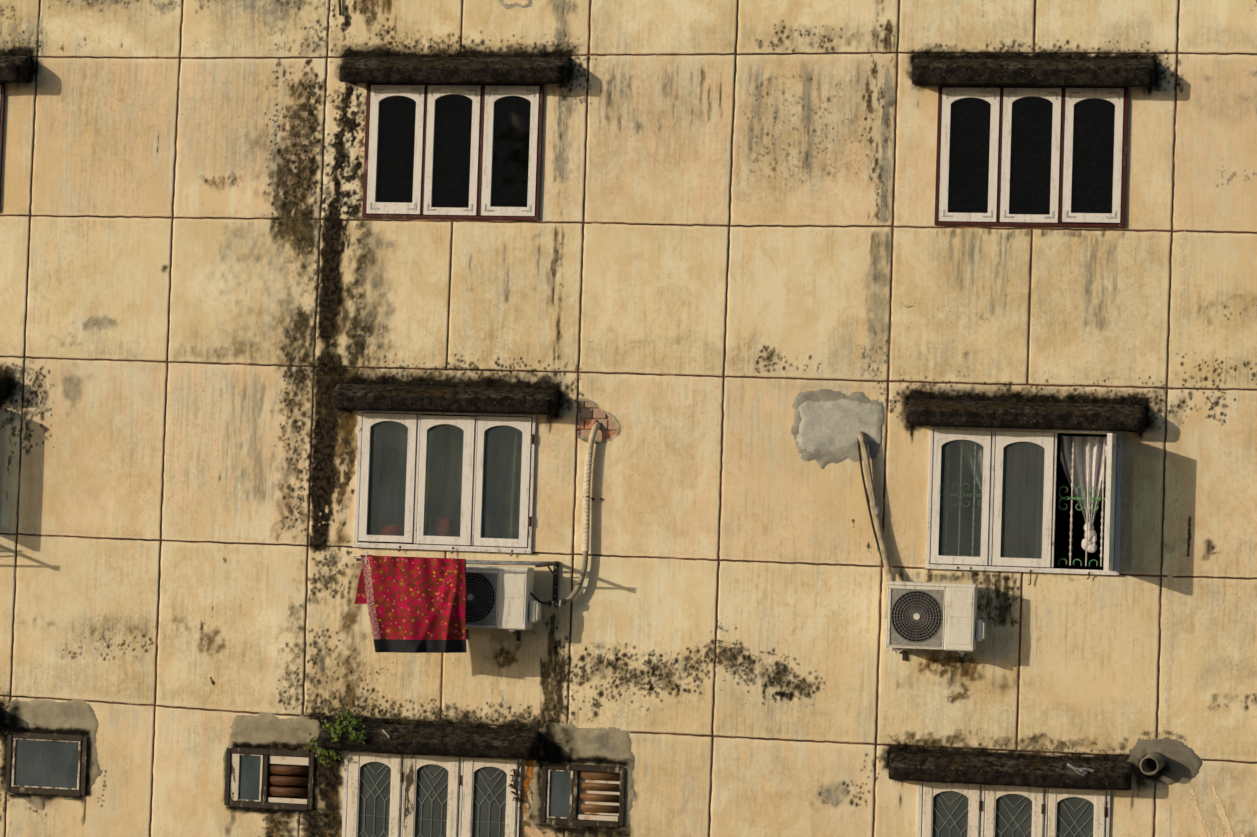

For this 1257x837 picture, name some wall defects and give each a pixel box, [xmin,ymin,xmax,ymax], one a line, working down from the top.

damp [265,0,396,722]
damp [2,364,75,471]
flaking render [577,398,619,444]
damp [200,623,224,652]
damp [540,614,825,727]
damp [262,750,345,837]
damp [519,813,535,837]